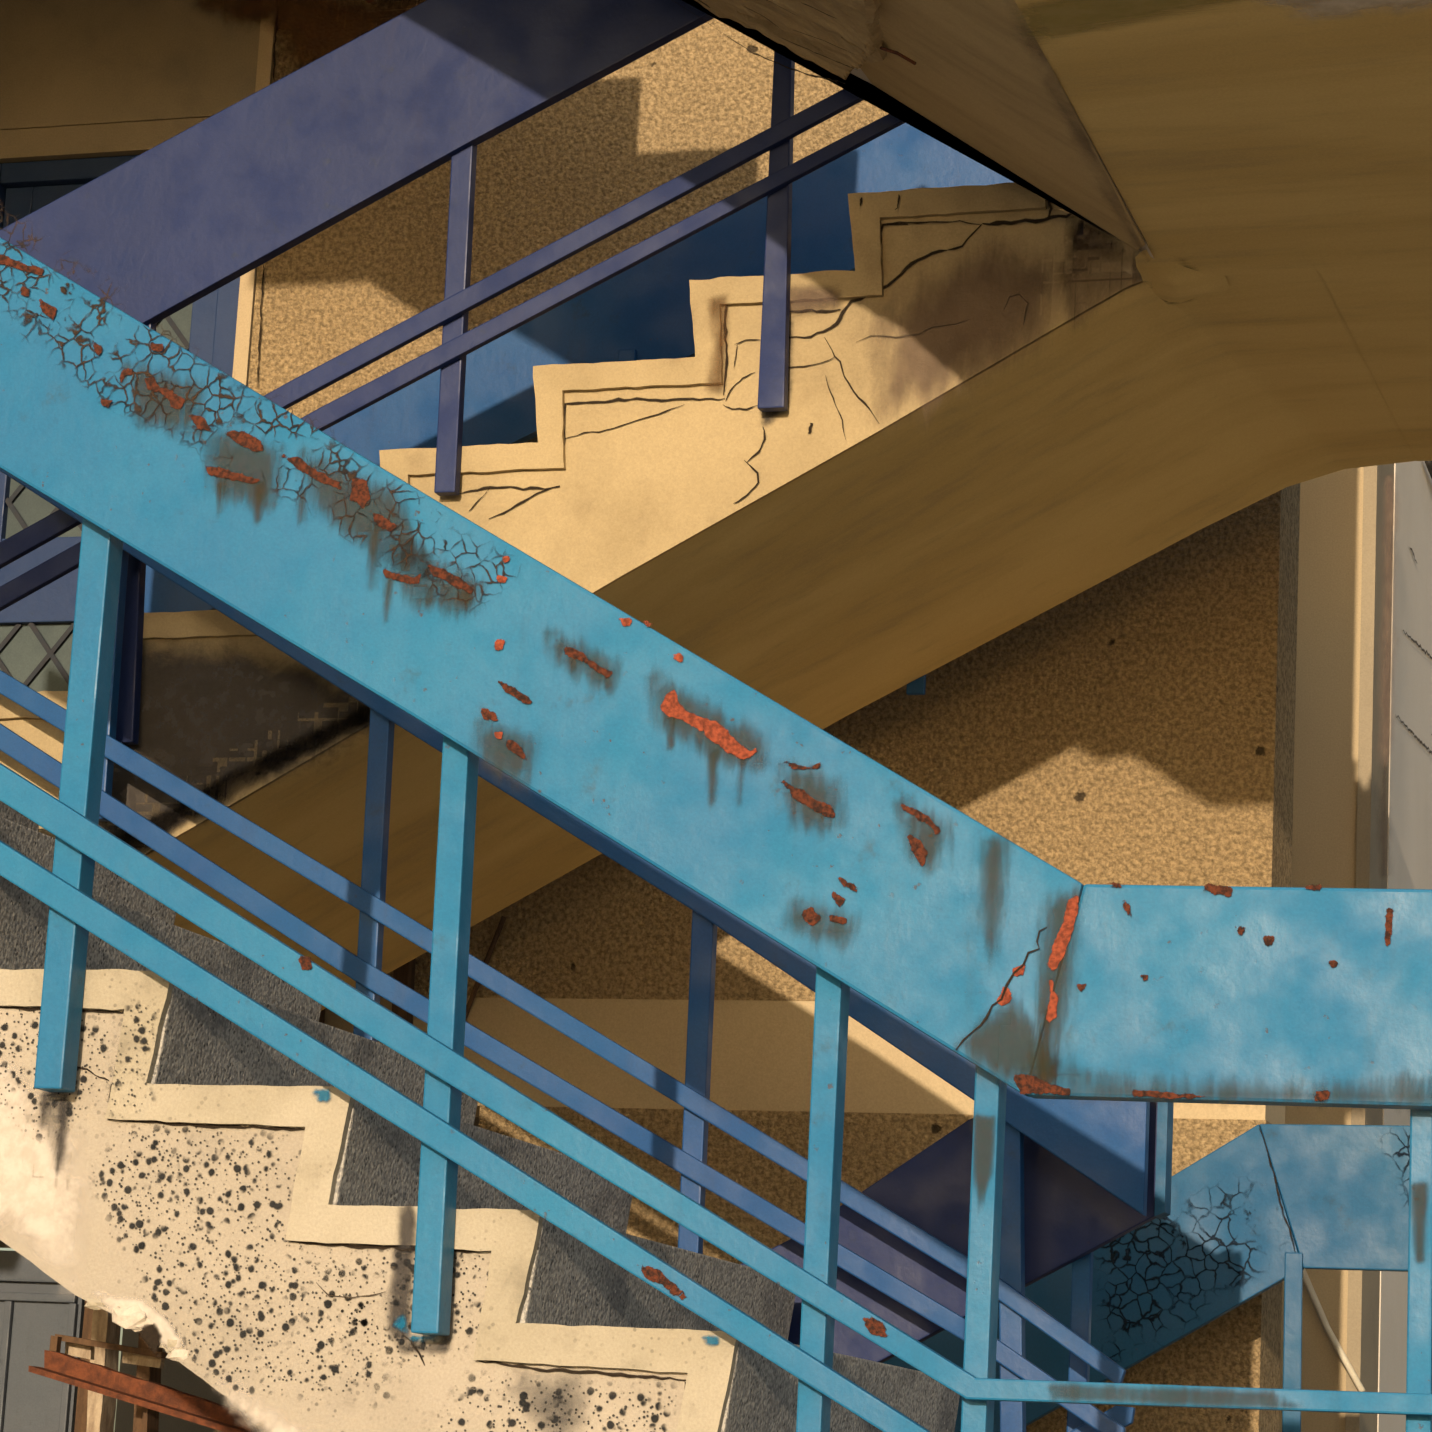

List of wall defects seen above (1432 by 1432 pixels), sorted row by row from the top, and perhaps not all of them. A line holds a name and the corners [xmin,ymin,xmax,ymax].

rust [0,255,57,320]
crack [256,265,264,388]
crack [564,194,1072,504]
damp [893,253,1046,397]
damp [1067,215,1136,321]
rust [119,368,474,607]
rust [661,690,762,801]
crack [956,927,1047,1050]
rust [970,895,1086,1096]
damp [0,1004,156,1262]
damp [97,1127,488,1432]
crack [1101,1129,1295,1360]